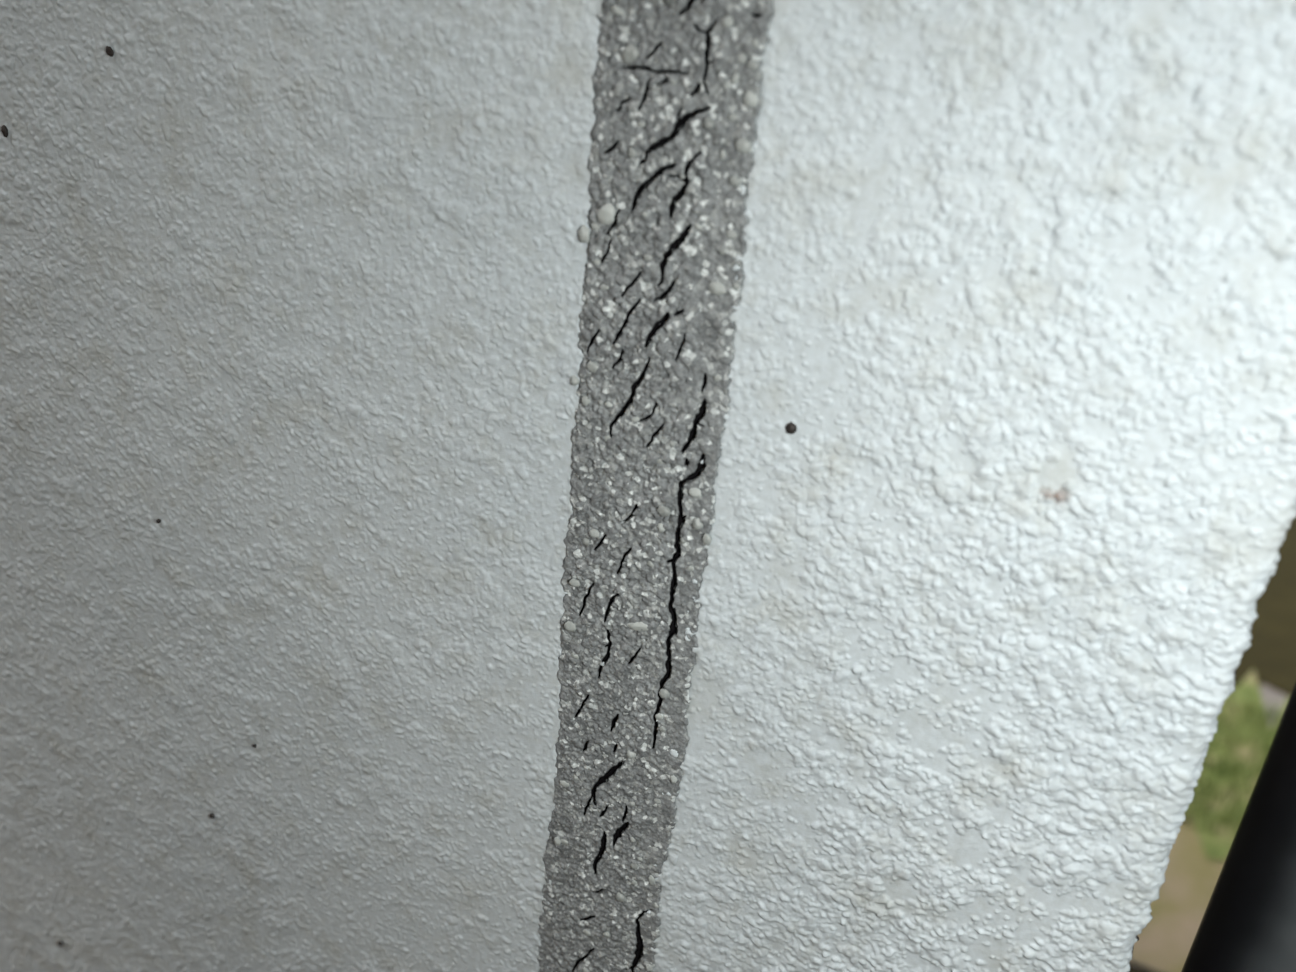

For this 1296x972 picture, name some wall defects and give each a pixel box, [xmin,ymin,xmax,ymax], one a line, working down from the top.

crack [572,0,718,972]